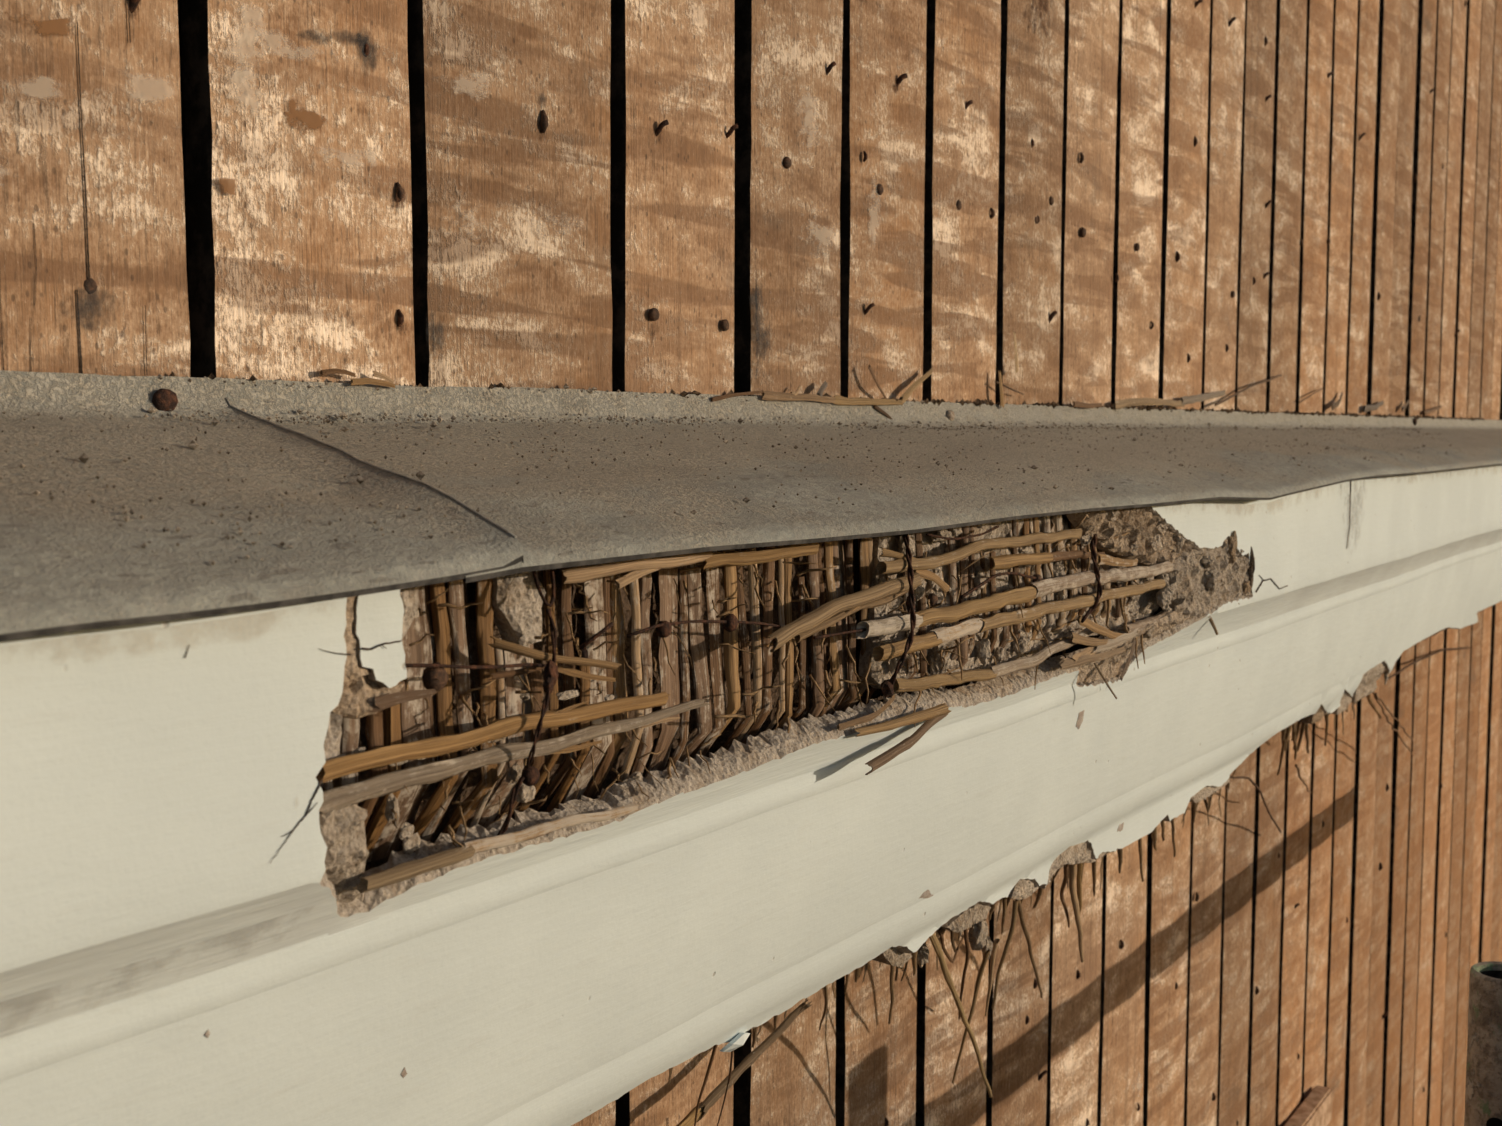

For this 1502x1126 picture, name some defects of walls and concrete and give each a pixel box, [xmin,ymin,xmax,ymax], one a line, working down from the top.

spalling [492,571,546,647]
spalling [859,507,1255,699]
spalling [324,587,418,760]
spalling [556,690,579,700]
spalling [1297,663,1388,724]
spalling [506,763,536,803]
spalling [1189,777,1230,803]
spalling [319,793,422,903]
spalling [1007,843,1106,900]
spalling [872,943,929,968]
spalling [941,903,993,959]
peeling [720,1032,750,1052]